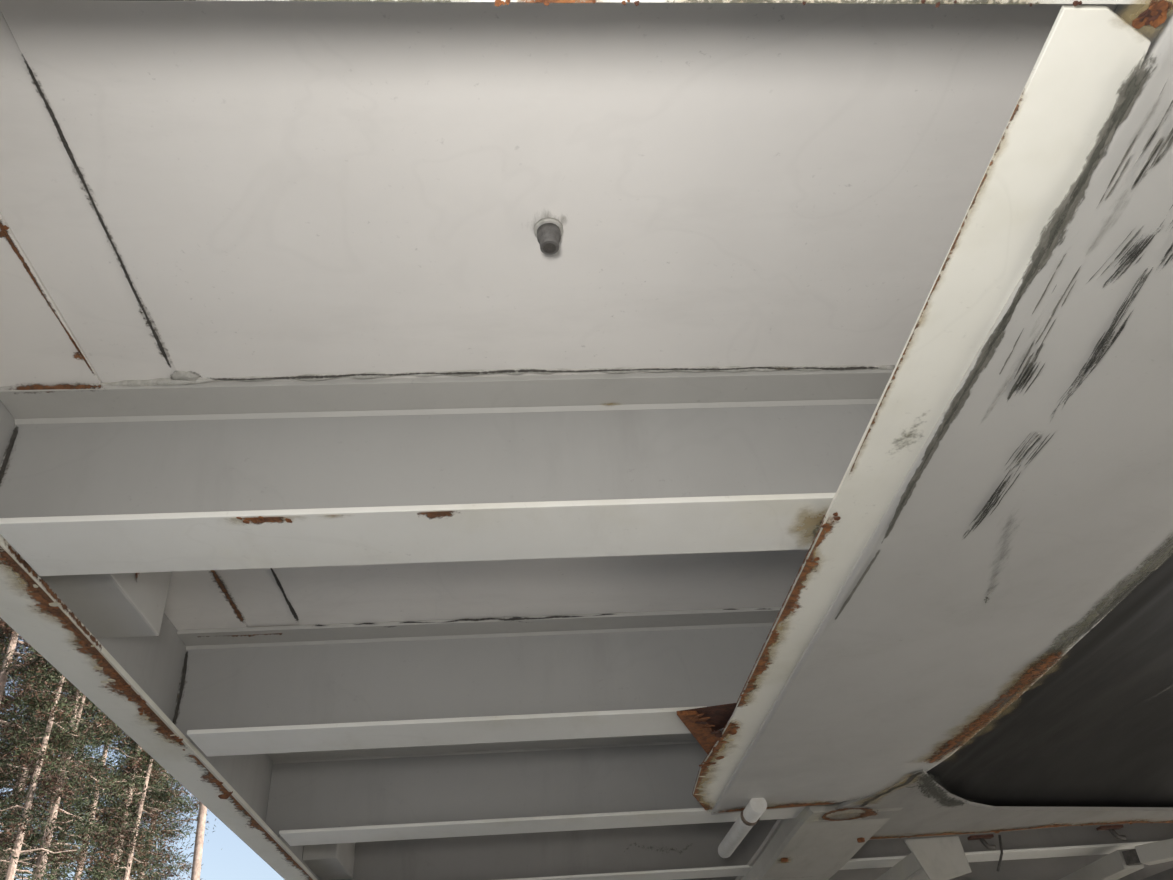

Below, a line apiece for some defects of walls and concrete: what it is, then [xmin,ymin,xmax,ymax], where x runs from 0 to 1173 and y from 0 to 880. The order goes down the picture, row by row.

corrosion [667,0,1039,8]
corrosion [1131,0,1173,29]
damp [835,56,1173,619]
corrosion [16,383,101,393]
corrosion [236,516,292,524]
corrosion [417,511,454,519]
corrosion [737,512,840,707]
corrosion [0,543,313,880]
corrosion [924,651,1063,763]
corrosion [692,722,745,813]